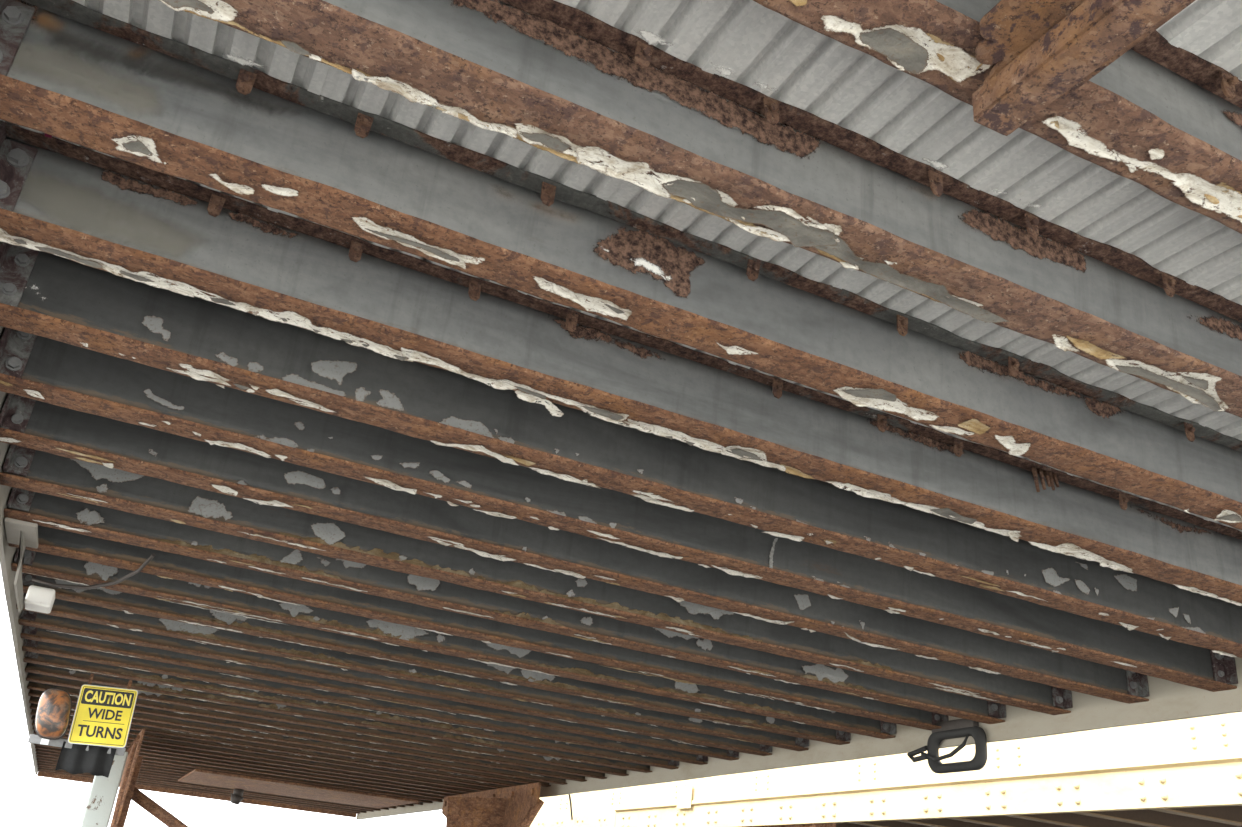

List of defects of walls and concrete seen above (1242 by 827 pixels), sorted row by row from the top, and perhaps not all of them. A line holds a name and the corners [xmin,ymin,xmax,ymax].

rust [453,0,820,158]
peeling [111,135,168,164]
rust [101,169,197,206]
peeling [158,0,1009,323]
peeling [1042,116,1242,223]
rust [593,227,705,298]
rust [958,208,1086,273]
rust [1187,315,1242,340]
rust [959,351,1122,419]
peeling [1052,334,1231,412]
peeling [22,562,836,783]
peeling [728,659,893,700]